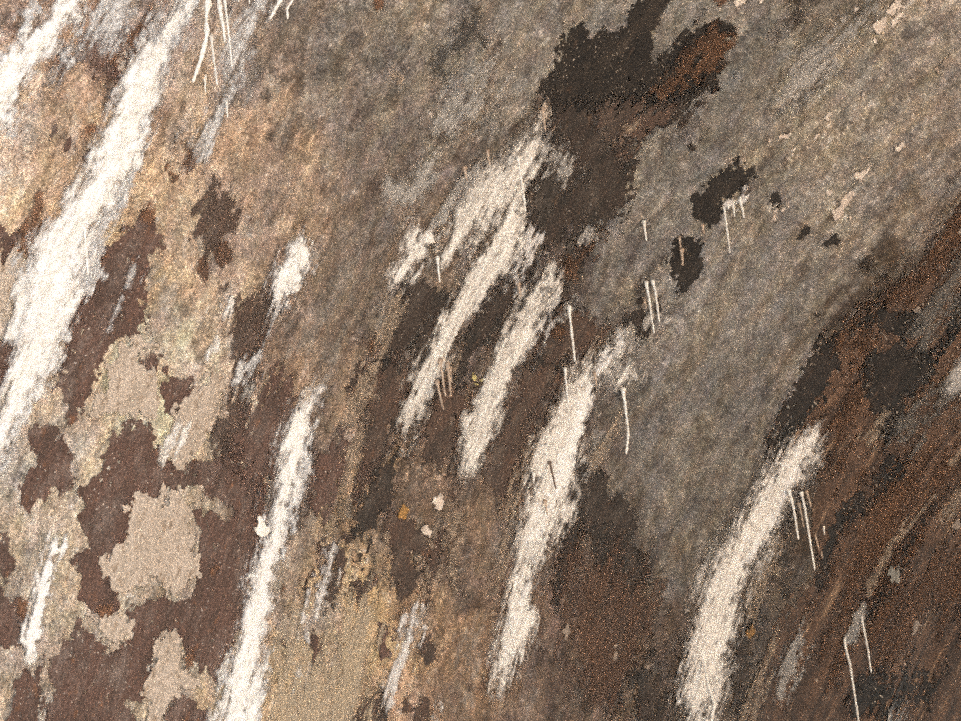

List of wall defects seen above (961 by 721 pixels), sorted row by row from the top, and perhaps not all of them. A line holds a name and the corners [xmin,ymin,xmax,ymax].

water stain [269,0,293,19]
water stain [778,0,881,112]
water stain [432,53,506,136]
water stain [0,0,267,473]
water stain [384,152,439,205]
water stain [665,156,757,297]
water stain [768,192,782,208]
water stain [819,234,840,248]
water stain [14,422,77,514]
water stain [344,566,380,607]
water stain [304,628,324,666]
water stain [417,625,444,666]